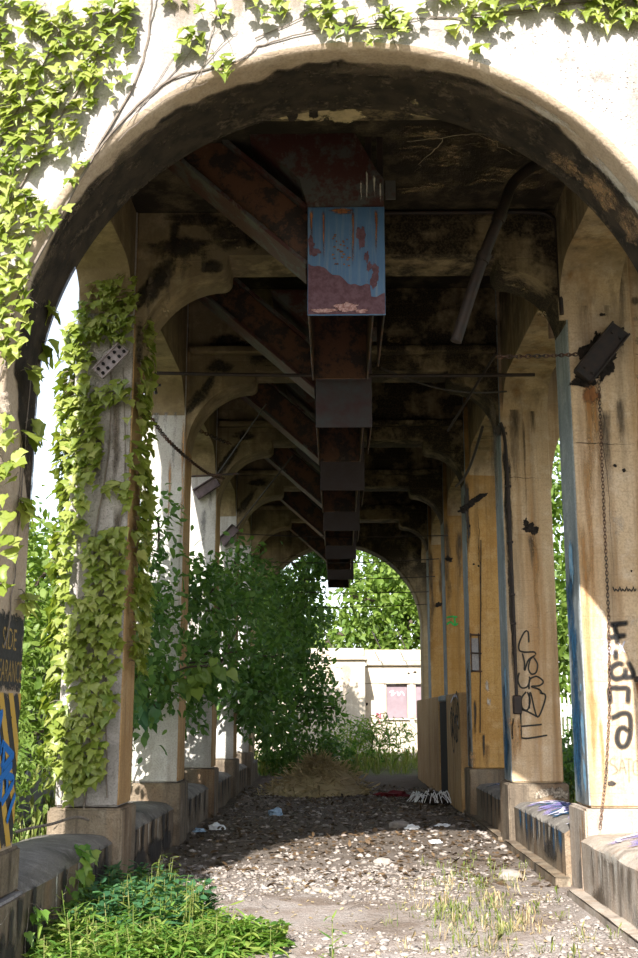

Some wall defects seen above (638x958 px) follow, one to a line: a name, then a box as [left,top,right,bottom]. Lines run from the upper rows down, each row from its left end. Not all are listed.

peeling [523,100,568,128]
peeling [558,158,638,235]
corrosion [310,208,354,266]
corrosion [311,302,368,313]
corrosion [581,385,600,606]
leakage [490,399,518,678]
corrosion [590,697,604,765]